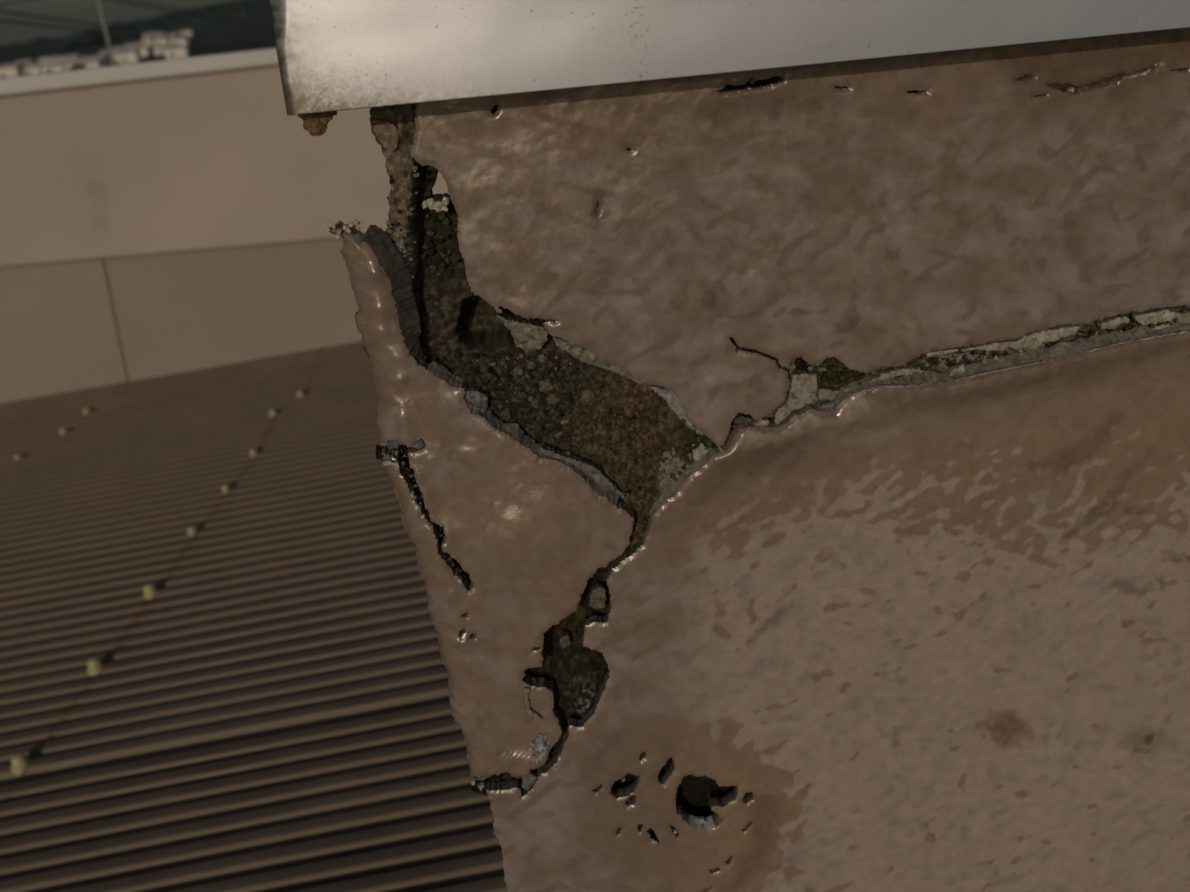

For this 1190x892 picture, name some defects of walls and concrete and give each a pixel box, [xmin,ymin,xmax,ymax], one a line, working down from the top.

crack [731,304,1190,429]
crack [375,439,472,584]
spalling [325,103,733,779]